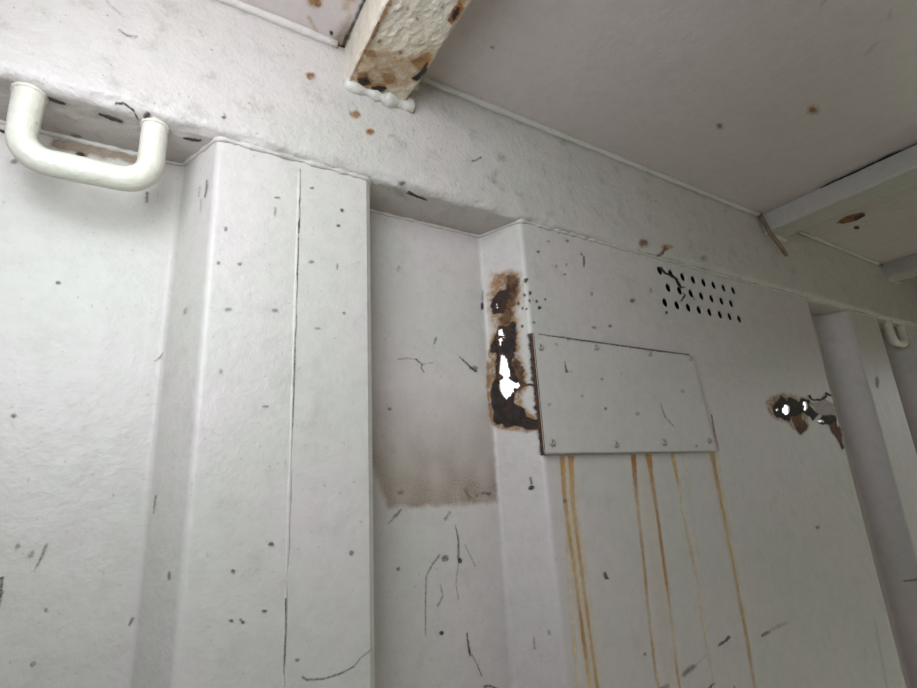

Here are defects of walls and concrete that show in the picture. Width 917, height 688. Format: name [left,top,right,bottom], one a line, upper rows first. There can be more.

corrosion [351,0,396,93]
corrosion [410,52,431,81]
peeling [490,276,538,430]
corrosion [528,334,539,438]
peeling [773,395,845,450]
corrosion [631,454,655,492]
corrosion [711,453,726,520]
corrosion [560,456,599,688]
corrosion [656,511,668,592]